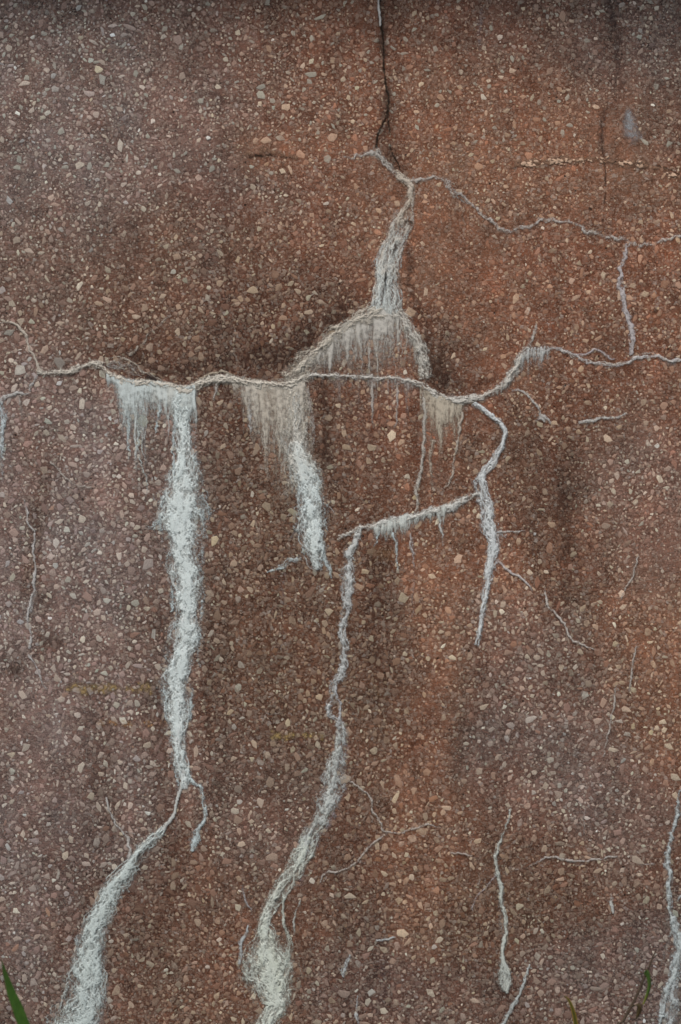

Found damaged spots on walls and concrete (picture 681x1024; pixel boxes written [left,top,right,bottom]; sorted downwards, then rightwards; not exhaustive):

crack [0,0,681,424]
crack [24,500,46,688]
damp [47,362,210,1024]
damp [232,170,536,1024]
crack [544,591,593,649]
crack [603,646,637,757]
crack [320,781,434,883]
crack [540,855,617,863]